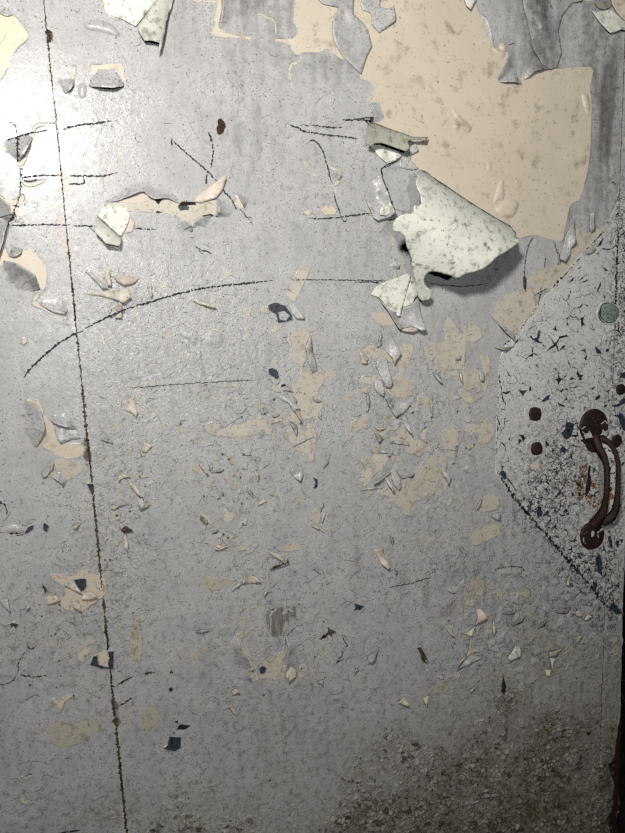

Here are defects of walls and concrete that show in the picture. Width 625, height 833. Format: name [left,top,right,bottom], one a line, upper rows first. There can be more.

peeling [101,0,156,27]
peeling [275,0,345,60]
peeling [0,178,68,317]
peeling [104,175,248,235]
crack [381,158,404,212]
peeling [345,0,604,555]
peeling [20,398,86,488]
peeling [42,438,153,670]
peeling [173,266,338,557]
crack [105,190,625,776]
corrosion [576,464,599,510]
peeling [140,658,618,833]